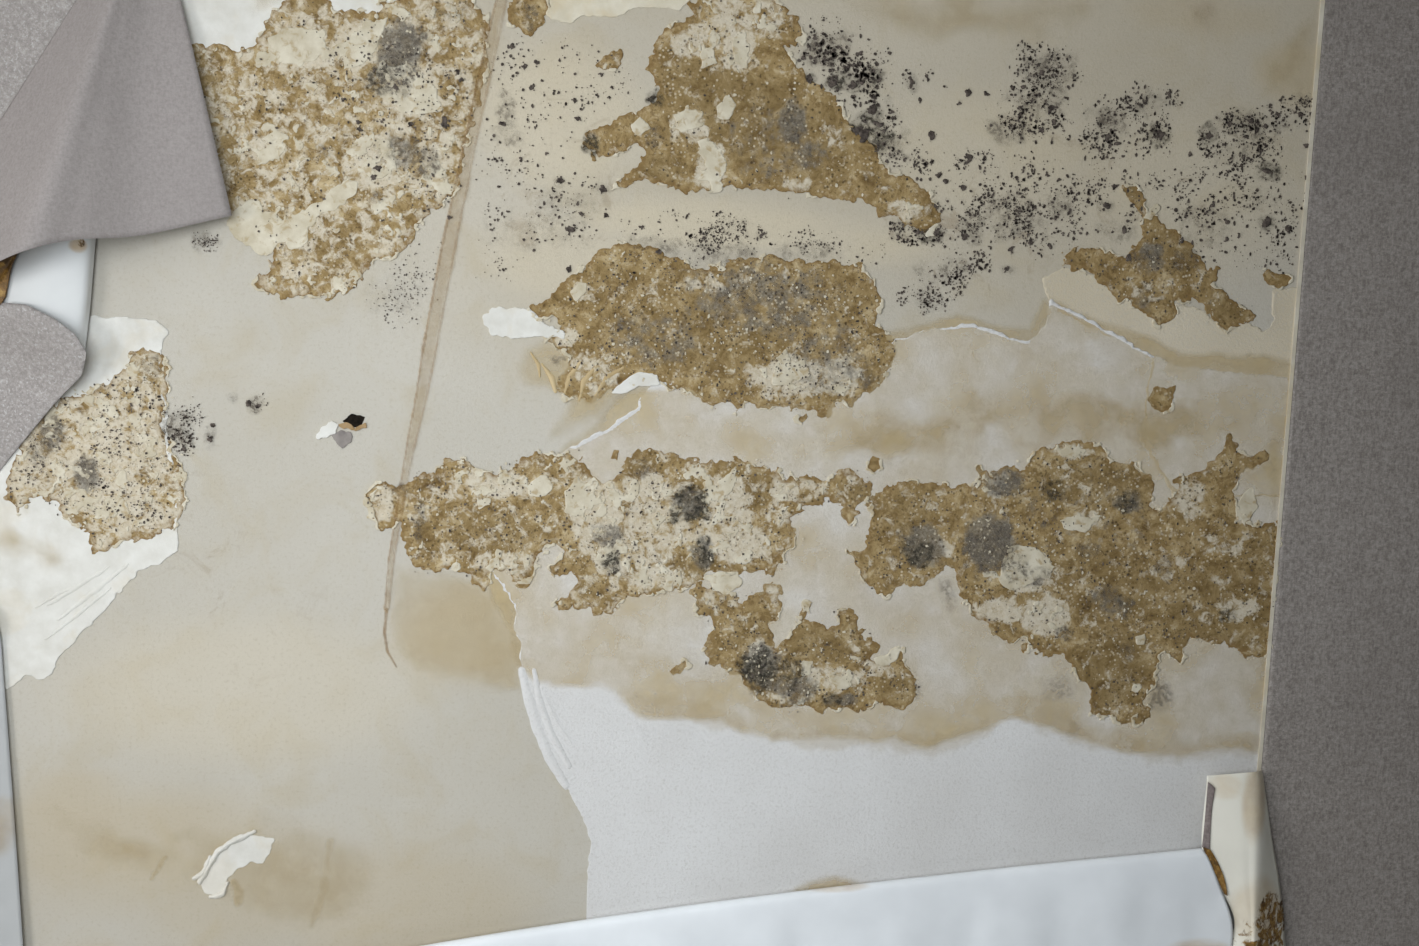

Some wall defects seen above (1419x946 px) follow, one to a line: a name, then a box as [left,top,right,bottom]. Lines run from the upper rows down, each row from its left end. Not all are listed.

flaking render [3,347,189,554]
flaking render [192,0,551,301]
leakage [607,392,657,427]
flaking render [527,240,897,425]
flaking render [581,0,943,237]
leakage [475,17,1313,330]
flaking render [1061,183,1256,334]
leakage [488,569,518,614]
flaking render [363,433,1283,728]
leakage [636,669,771,718]
leakage [812,699,890,733]
peeling [192,829,275,899]